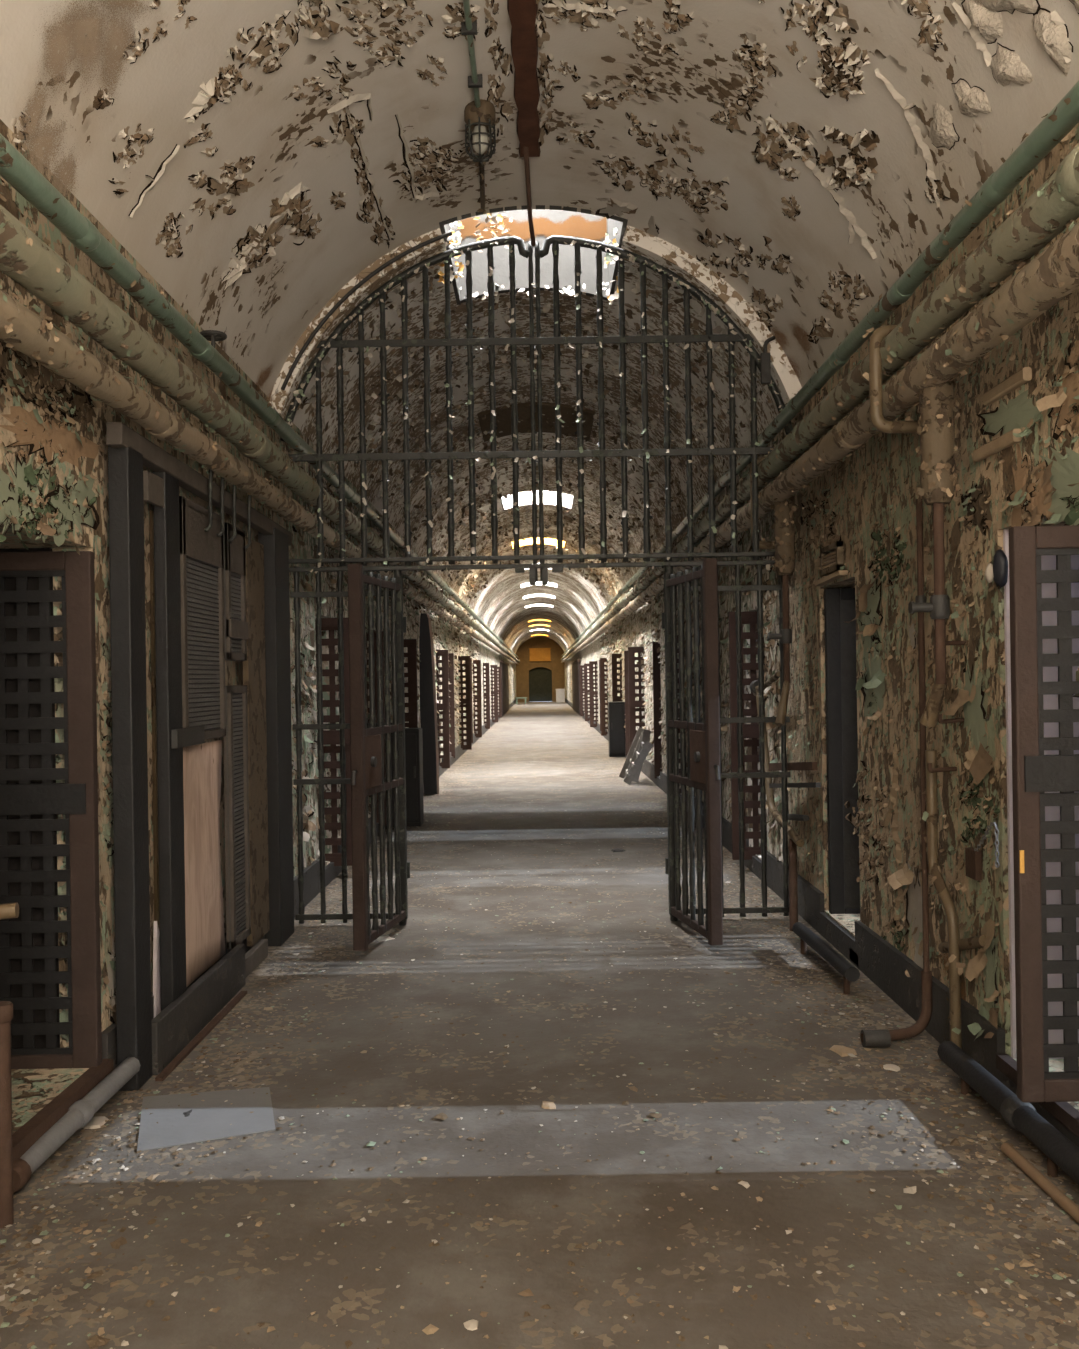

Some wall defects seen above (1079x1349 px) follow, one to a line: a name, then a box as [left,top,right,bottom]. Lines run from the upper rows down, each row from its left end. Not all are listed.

water stain [15,0,153,200]
crack [129,144,180,218]